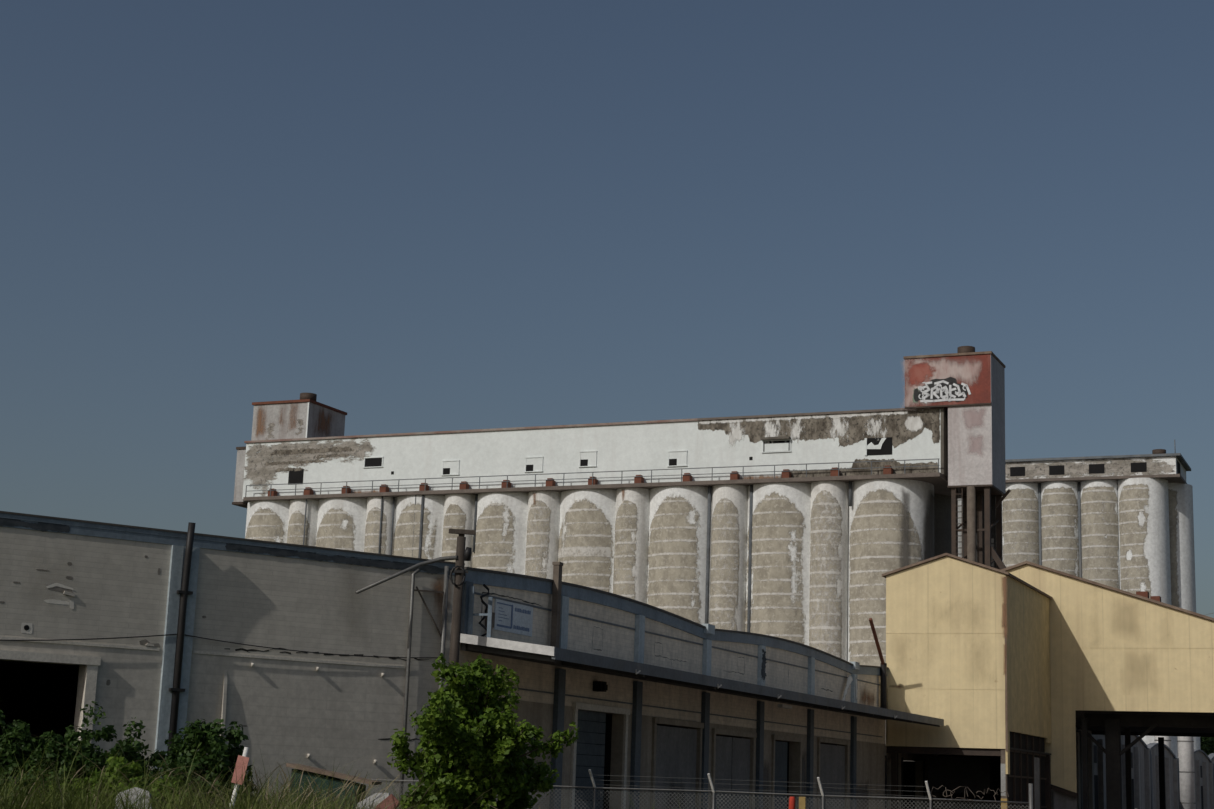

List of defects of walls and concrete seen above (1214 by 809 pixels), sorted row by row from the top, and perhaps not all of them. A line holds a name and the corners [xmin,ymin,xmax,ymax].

rust [256,410,264,435]
spalling [36,562,75,609]
peeling [225,358,981,701]
peeling [1002,484,1151,598]
peeling [1168,489,1179,607]